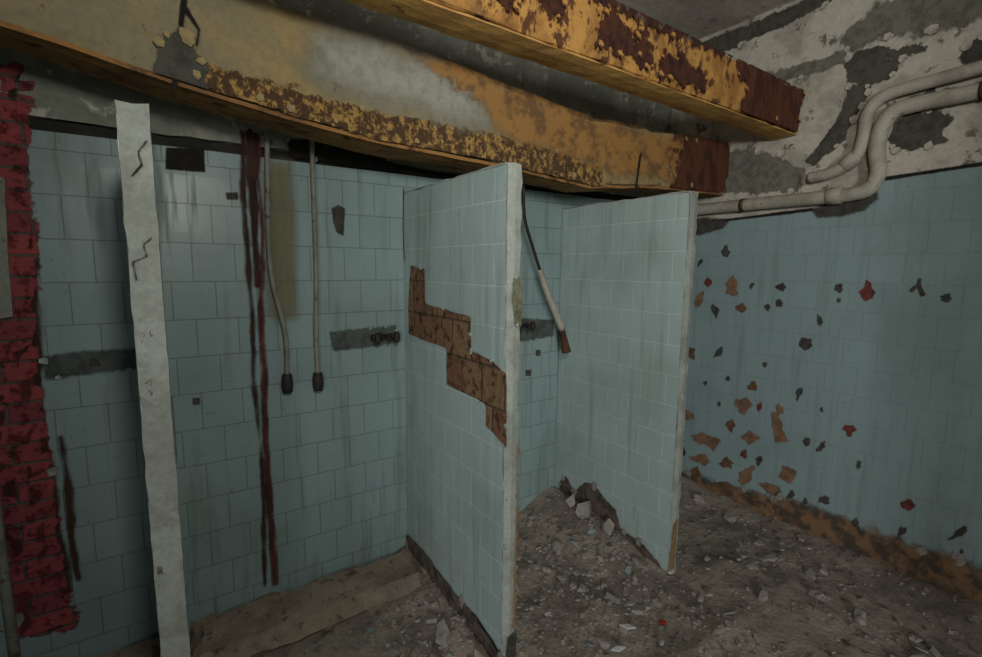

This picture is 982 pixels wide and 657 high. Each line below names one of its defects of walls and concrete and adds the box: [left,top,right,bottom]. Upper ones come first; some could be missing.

peeling [694,277,720,318]
peeling [726,276,747,313]
peeling [764,283,786,311]
peeling [859,280,876,301]
peeling [330,265,507,447]
peeling [799,337,813,350]
flaking render [681,381,982,604]